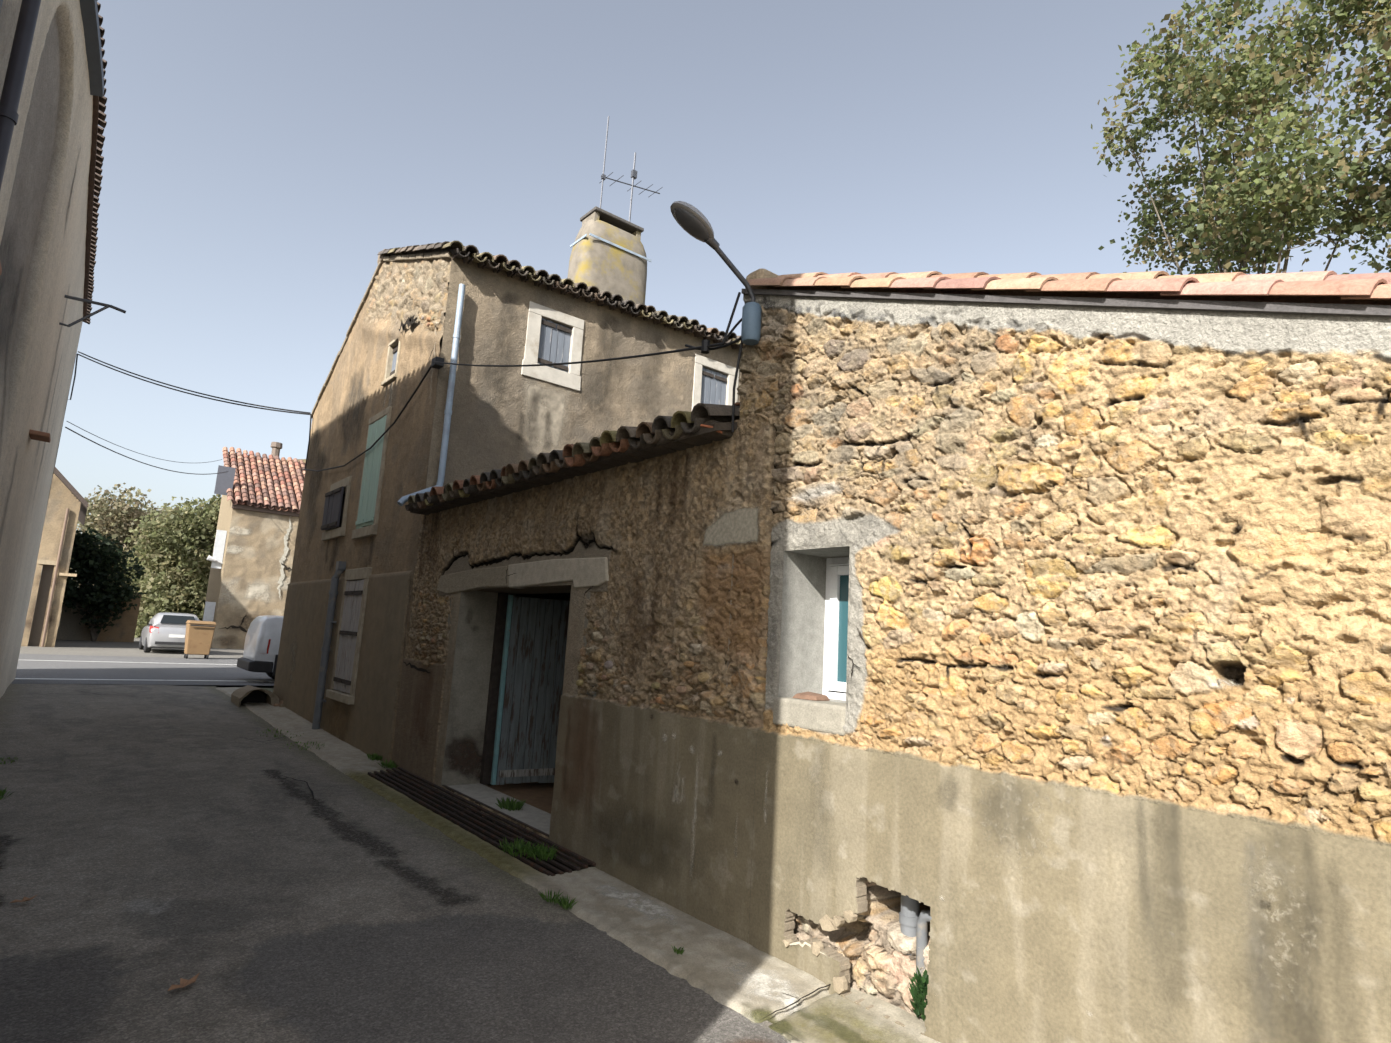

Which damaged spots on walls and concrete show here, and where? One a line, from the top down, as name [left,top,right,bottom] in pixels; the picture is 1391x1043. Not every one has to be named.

crack [277,516,292,598]
crack [444,524,616,585]
crack [220,615,247,632]
spalling [782,877,942,1034]